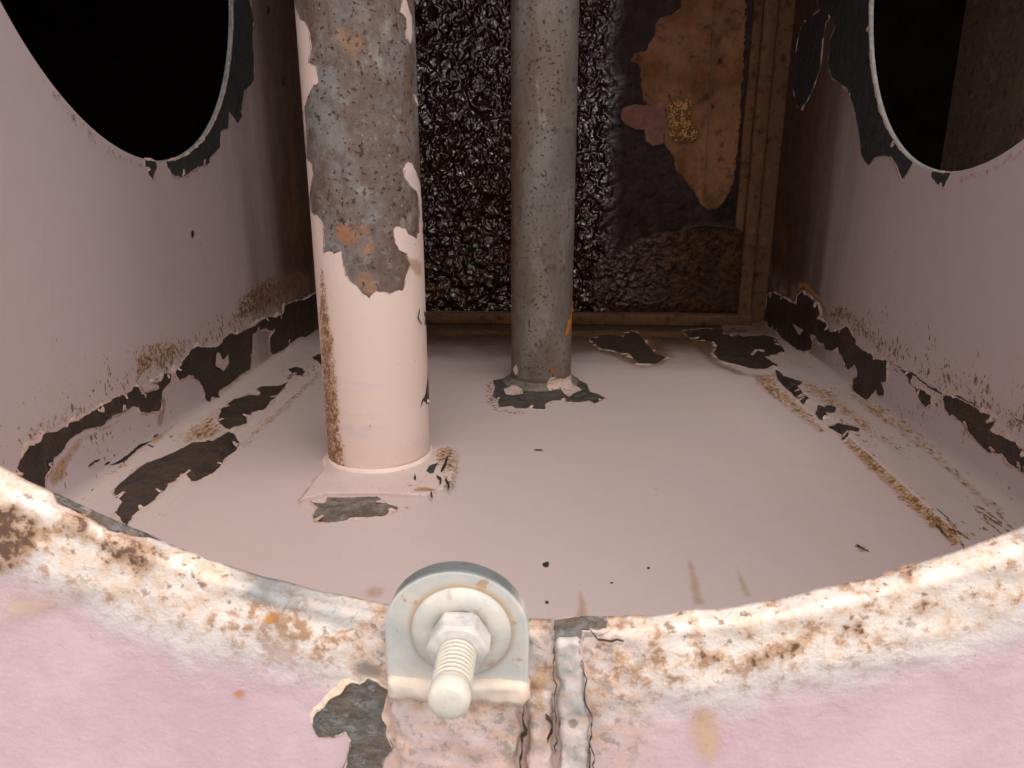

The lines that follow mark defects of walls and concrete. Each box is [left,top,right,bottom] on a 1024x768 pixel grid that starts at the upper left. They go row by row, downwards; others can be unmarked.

peeling [793,0,914,184]
peeling [13,292,322,546]
rust [249,266,345,466]
peeling [682,291,1024,477]
rust [0,504,158,575]
peeling [305,496,399,524]
rust [844,439,965,545]
peeling [310,676,395,768]
crack [519,618,558,768]
crack [581,660,595,768]
crack [582,629,624,643]
rust [745,628,817,672]